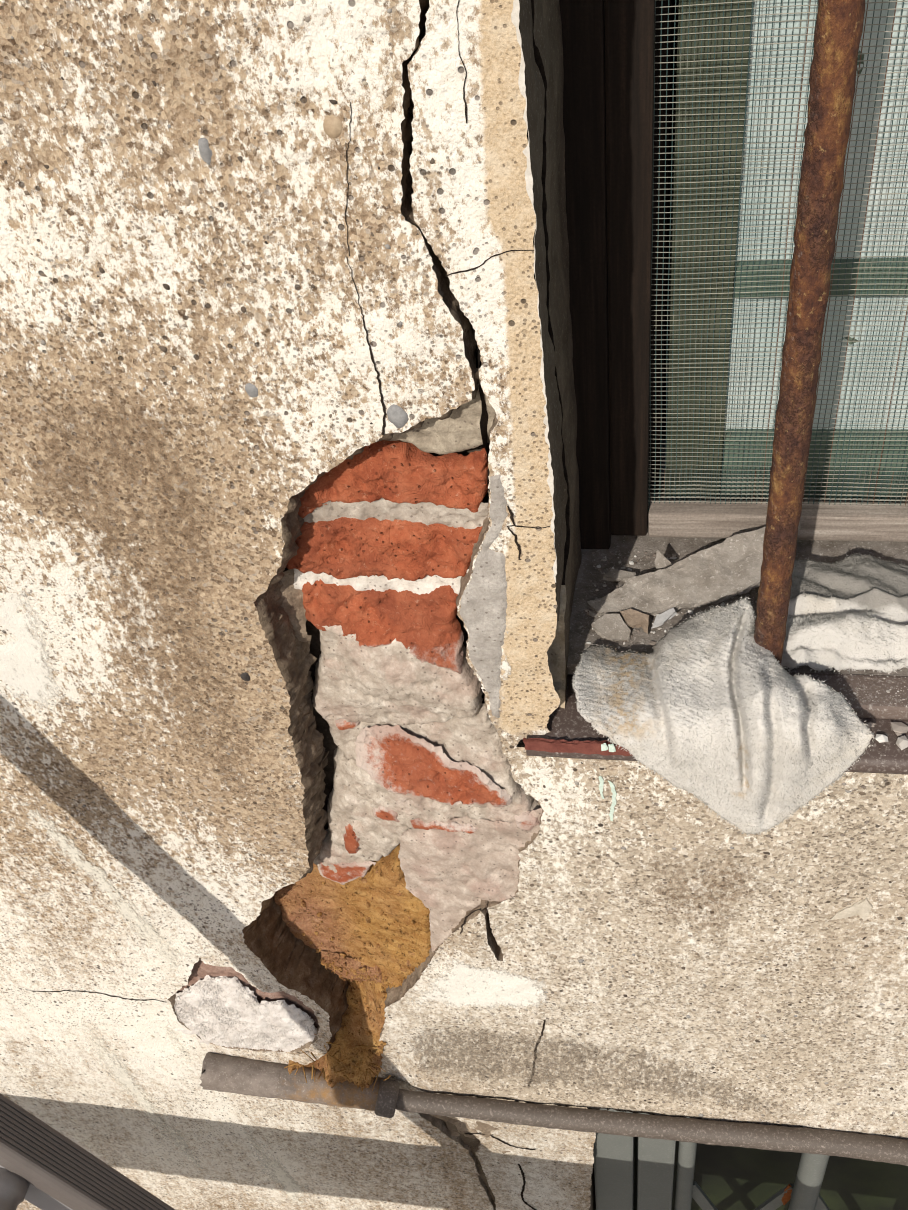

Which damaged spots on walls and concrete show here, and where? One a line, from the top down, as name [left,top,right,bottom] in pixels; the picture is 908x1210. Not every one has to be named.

crack [345,102,386,435]
crack [400,0,570,731]
spalling [253,358,544,1037]
spalling [167,887,349,1061]
crack [460,899,504,961]
crack [418,1113,537,1210]